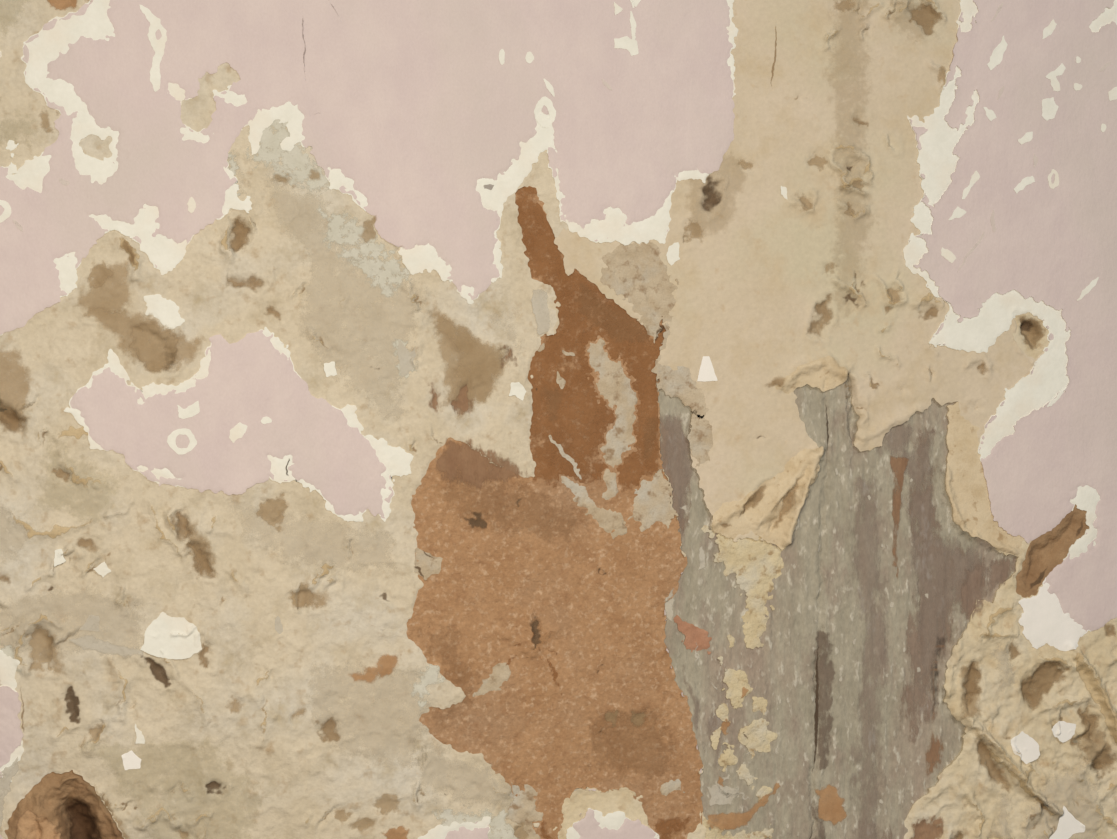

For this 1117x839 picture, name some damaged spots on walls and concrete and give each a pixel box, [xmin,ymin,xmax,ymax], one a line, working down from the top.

spalling [0,0,119,193]
spalling [0,96,707,839]
spalling [548,0,1117,839]